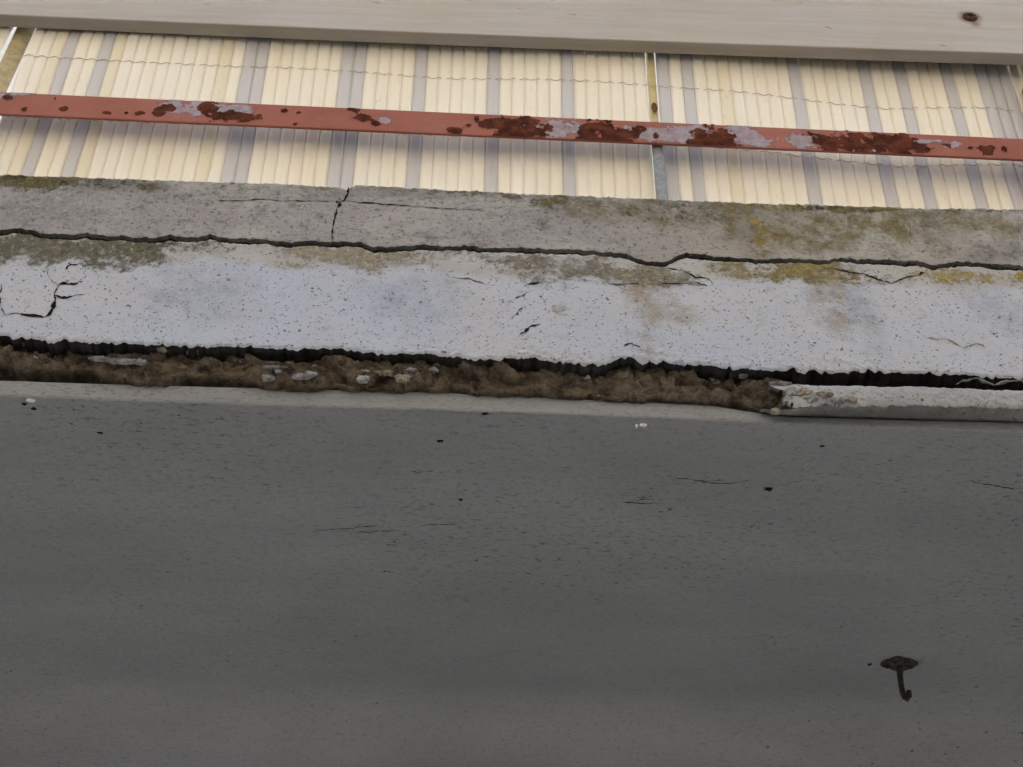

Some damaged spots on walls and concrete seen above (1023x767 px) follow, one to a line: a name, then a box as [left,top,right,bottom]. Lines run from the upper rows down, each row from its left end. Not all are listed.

corrosion [197,101,263,122]
corrosion [347,108,381,126]
corrosion [446,115,553,137]
corrosion [566,119,659,143]
corrosion [685,124,742,146]
corrosion [802,130,951,154]
corrosion [968,145,1007,155]
crack [0,187,729,318]
crack [820,262,1022,284]
crack [512,282,540,334]
spalling [0,340,857,417]